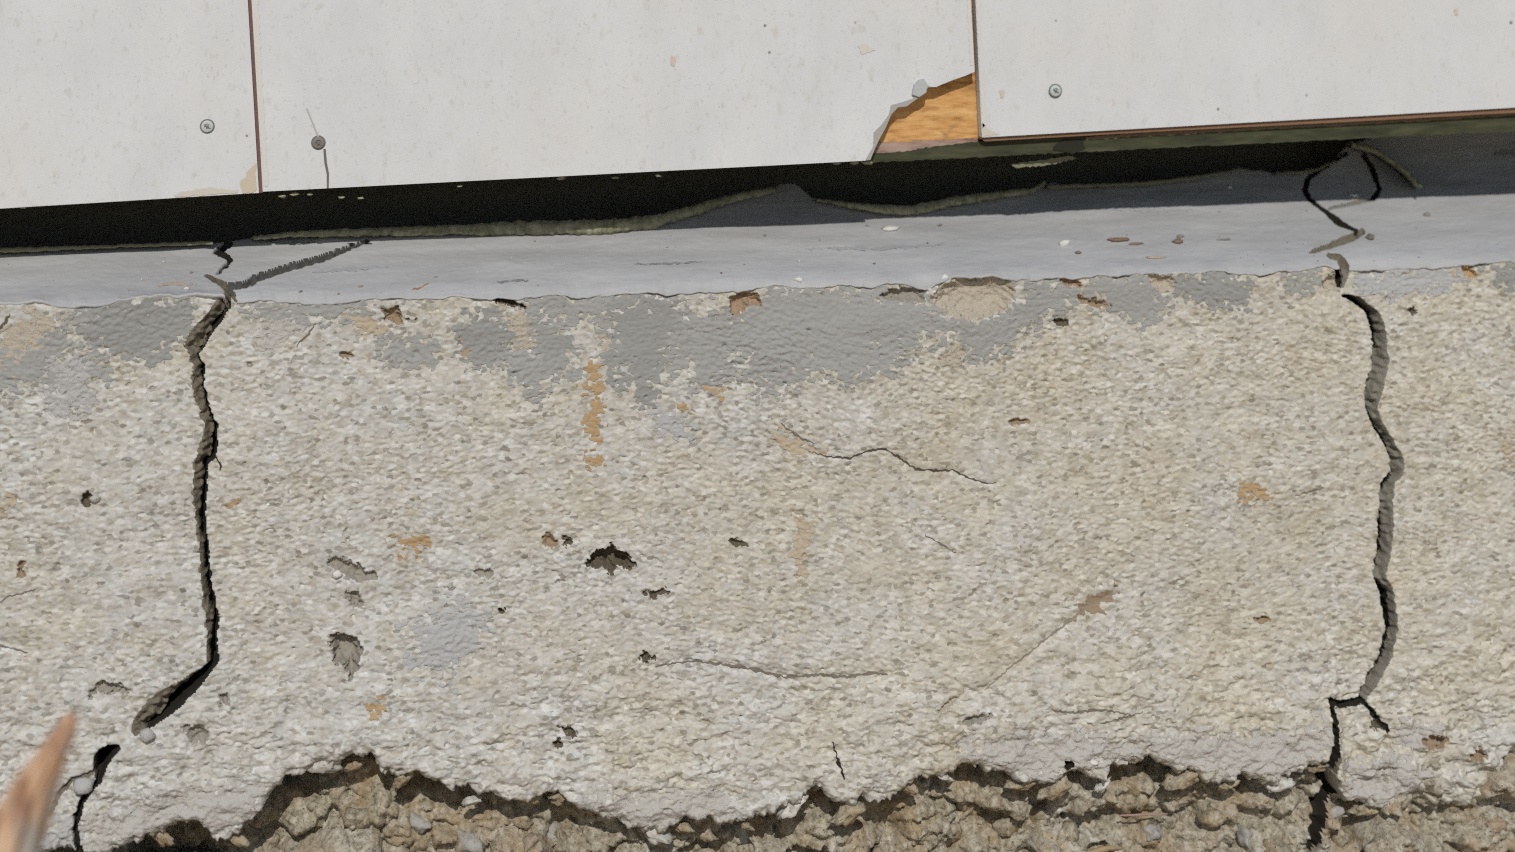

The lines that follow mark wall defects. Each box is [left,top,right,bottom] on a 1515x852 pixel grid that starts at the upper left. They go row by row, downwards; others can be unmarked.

spalling [866,79,929,160]
crack [53,239,370,852]
crack [1302,152,1405,851]
spalling [938,695,994,727]
spalling [113,718,1515,852]